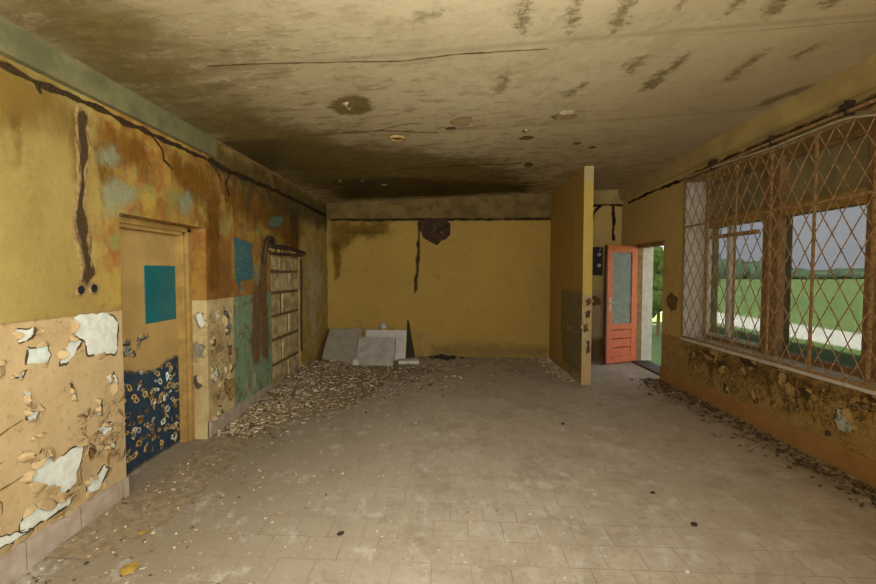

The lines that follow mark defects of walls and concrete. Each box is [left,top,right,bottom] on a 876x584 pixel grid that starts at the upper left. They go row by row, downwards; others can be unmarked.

damp [0,69,49,123]
crack [206,49,545,67]
damp [643,55,687,91]
crack [0,60,429,222]
damp [28,0,528,338]
spalling [419,218,451,245]
crack [446,215,551,223]
peeling [0,313,149,423]
peeling [192,307,236,422]
peeling [687,348,876,437]
peeling [0,356,180,554]